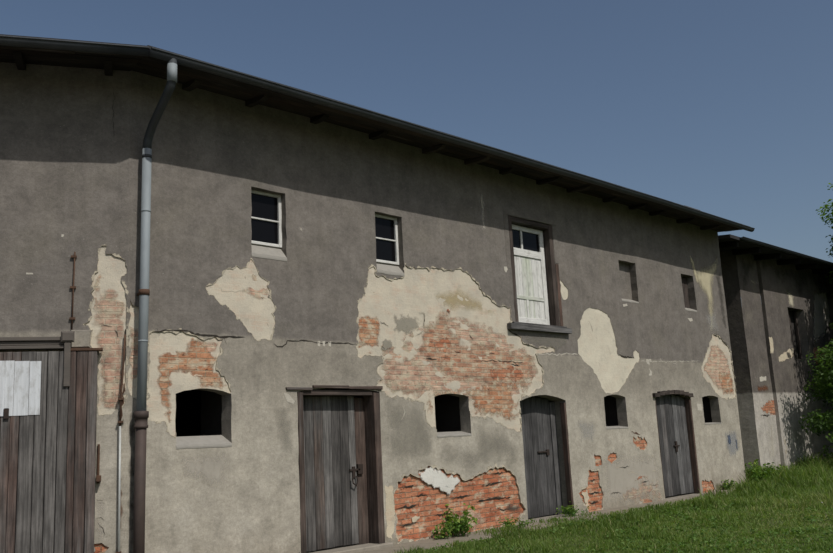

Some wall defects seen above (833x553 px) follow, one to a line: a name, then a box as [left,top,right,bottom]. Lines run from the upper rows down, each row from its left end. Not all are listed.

flaking render [206,258,276,341]
flaking render [83,244,231,438]
crack [154,329,242,342]
flaking render [356,263,555,432]
flaking render [577,308,661,394]
flaking render [701,334,737,400]
spalling [632,431,648,451]
spalling [761,400,779,417]
spalling [94,517,109,553]
spalling [384,464,526,544]
spalling [578,452,617,512]